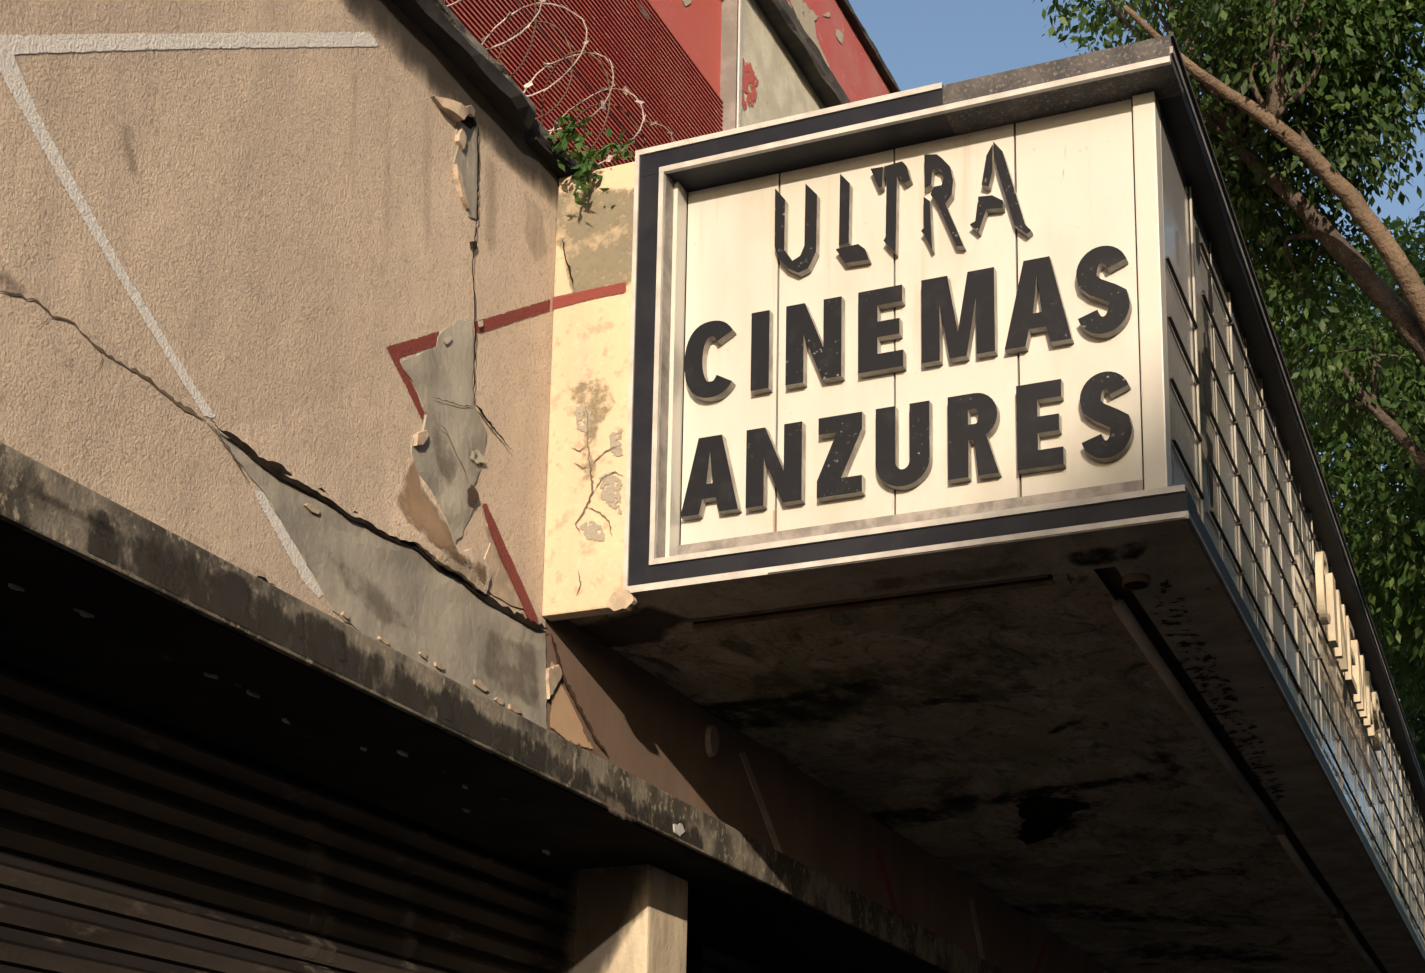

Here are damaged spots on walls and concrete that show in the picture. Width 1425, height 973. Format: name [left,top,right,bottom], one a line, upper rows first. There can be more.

peeling [788,0,843,67]
spalling [431,96,477,219]
crack [0,290,609,757]
spalling [204,320,547,729]
water stain [398,461,486,582]
spalling [579,520,605,541]
crack [573,401,623,534]
spalling [599,472,622,514]
water stain [1069,544,1145,566]
water stain [79,509,703,849]
water stain [695,679,880,729]
water stain [869,774,1149,828]